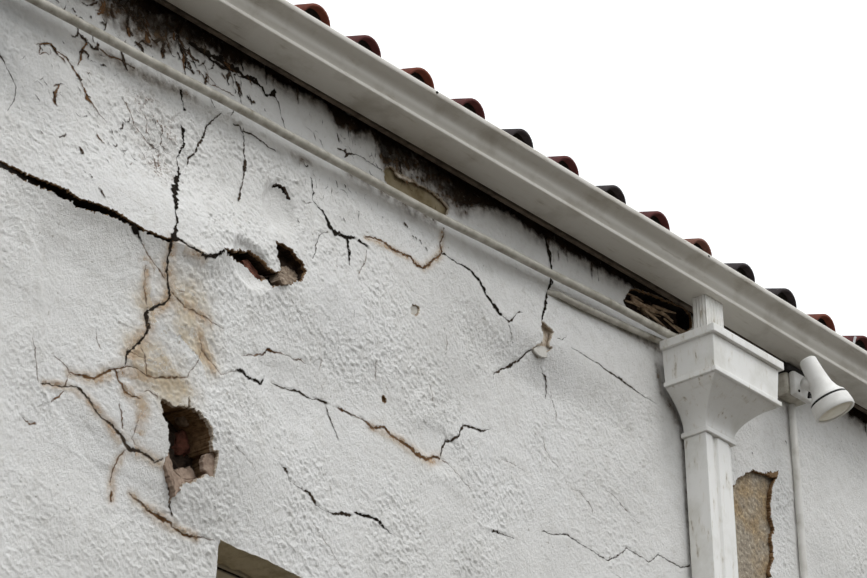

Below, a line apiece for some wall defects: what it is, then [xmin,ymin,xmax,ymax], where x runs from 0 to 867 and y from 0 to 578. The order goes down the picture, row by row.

damp [88,0,672,302]
spalling [369,153,449,216]
crack [0,0,490,540]
spalling [225,241,307,288]
crack [308,177,554,407]
spalling [623,288,692,334]
damp [131,341,188,404]
crack [559,337,656,404]
spalling [160,395,219,503]
damp [849,407,867,431]
crack [543,530,690,568]
peeling [733,469,779,578]